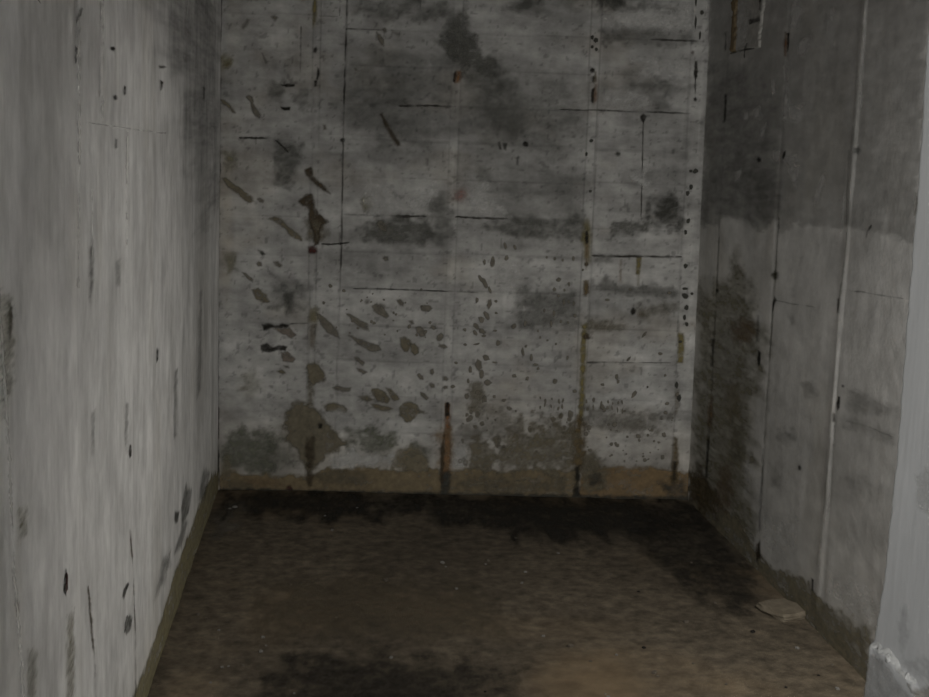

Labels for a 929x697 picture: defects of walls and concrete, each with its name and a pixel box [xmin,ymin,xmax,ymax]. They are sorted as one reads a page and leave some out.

damp [439,13,503,97]
rust [436,403,452,495]
damp [135,270,929,697]
spalling [869,641,921,697]